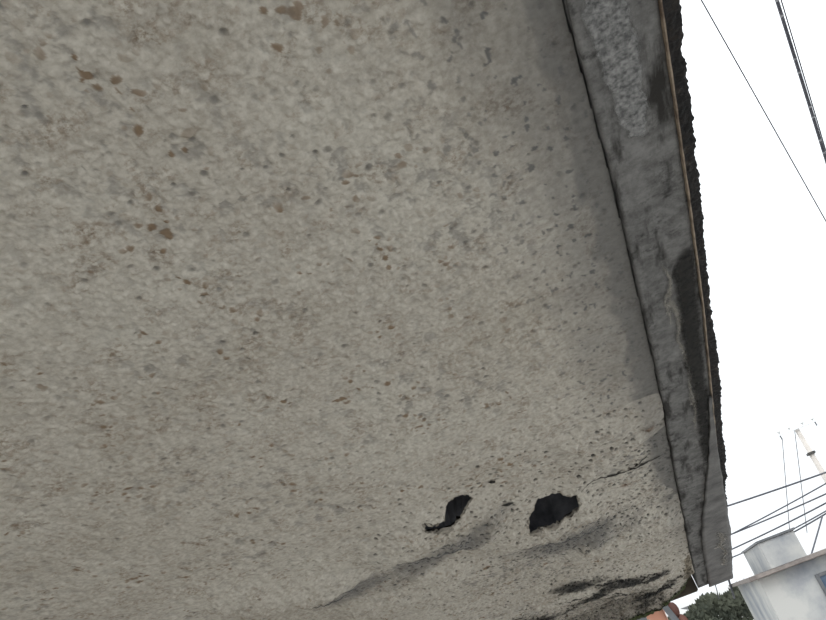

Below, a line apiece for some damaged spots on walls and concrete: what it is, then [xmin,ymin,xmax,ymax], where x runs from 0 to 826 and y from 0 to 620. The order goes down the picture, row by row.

damp [665,250,709,461]
spalling [425,495,471,536]
spalling [529,493,579,537]
damp [553,570,681,610]